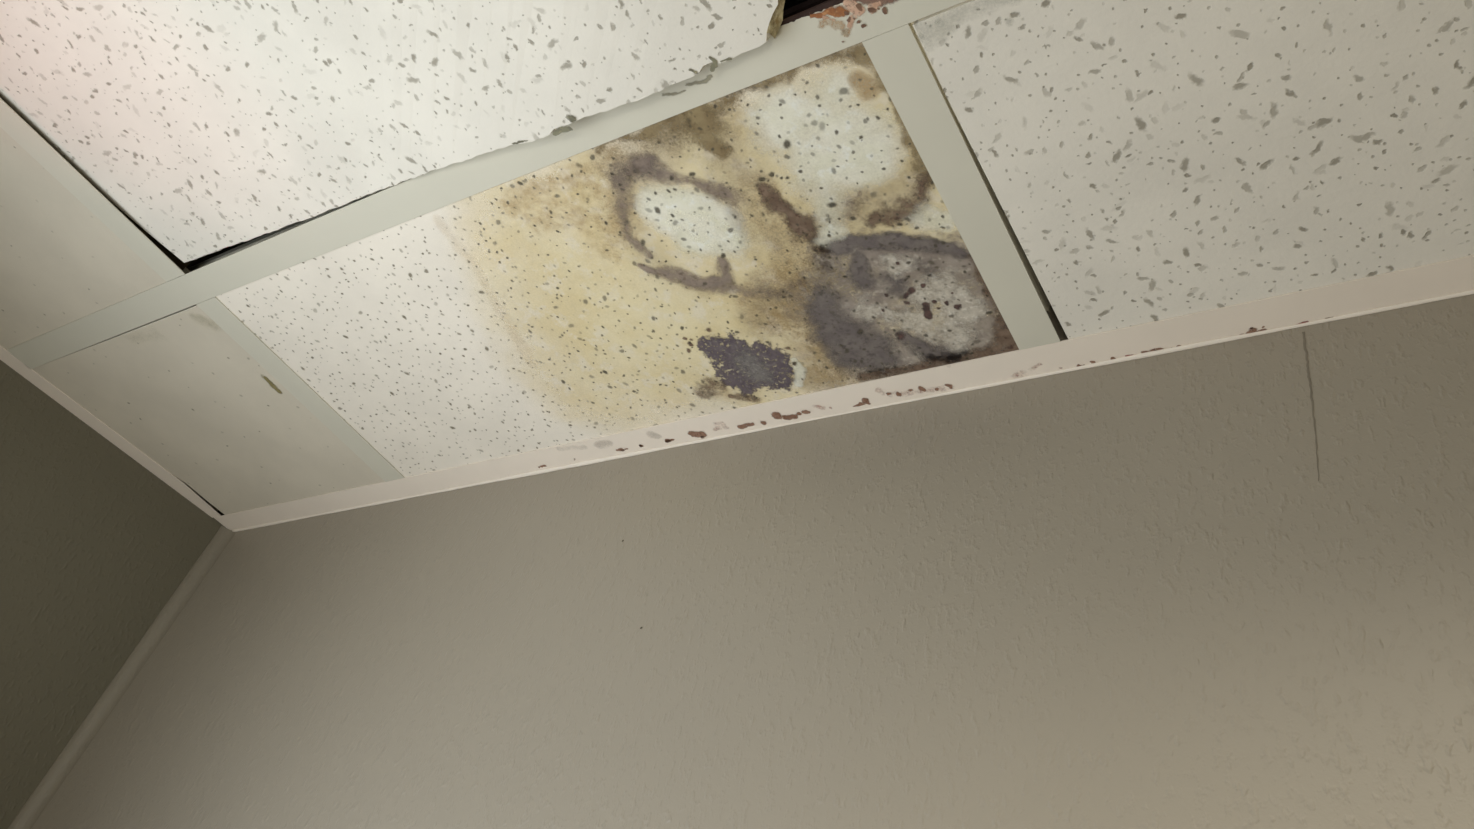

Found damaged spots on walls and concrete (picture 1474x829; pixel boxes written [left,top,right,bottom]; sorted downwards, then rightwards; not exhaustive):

rust [781,0,898,43]
water stain [494,43,1019,411]
rust [665,431,707,443]
rust [737,405,831,429]
crack [1302,332,1319,481]